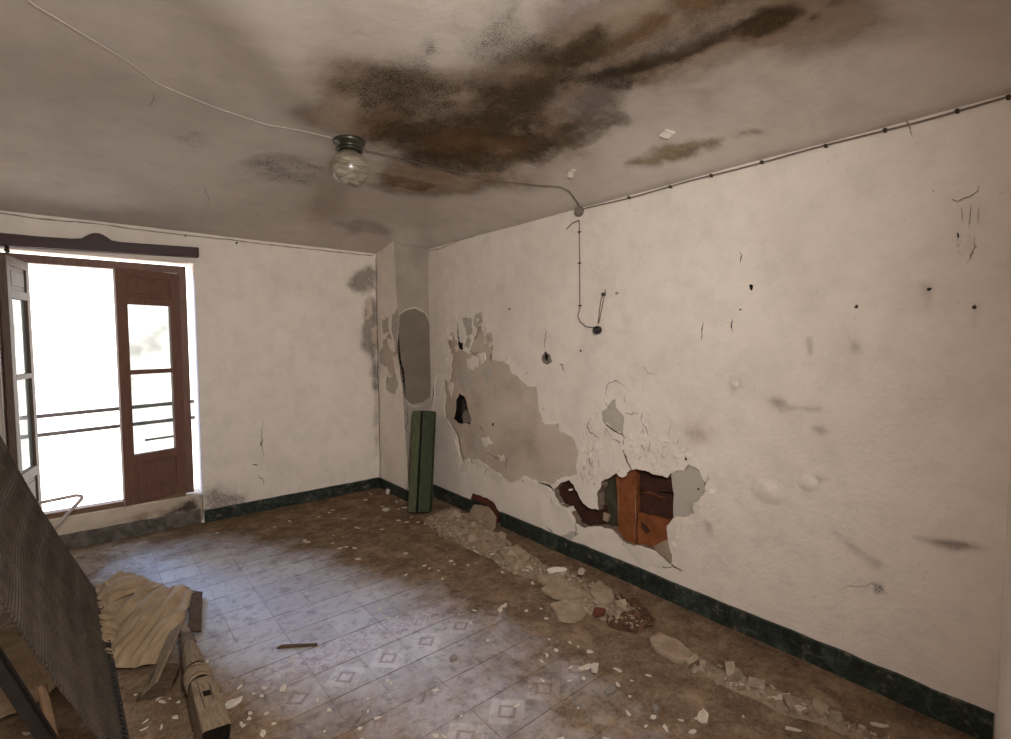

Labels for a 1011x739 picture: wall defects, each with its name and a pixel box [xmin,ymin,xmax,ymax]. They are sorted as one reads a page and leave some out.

leakage [303,0,876,195]
peeling [379,307,400,394]
peeling [444,311,706,571]